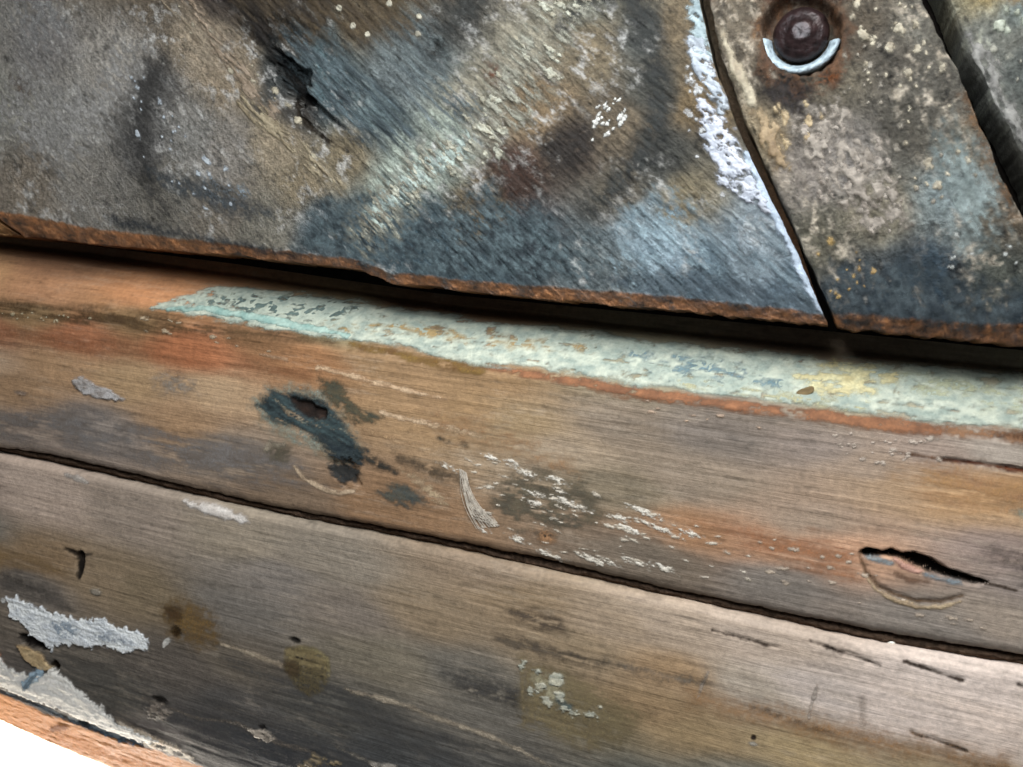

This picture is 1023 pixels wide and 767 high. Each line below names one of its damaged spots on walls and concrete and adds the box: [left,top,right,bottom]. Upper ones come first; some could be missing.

corrosion [753,0,850,117]
damp [0,365,601,543]
peeling [466,454,730,572]
crack [862,547,1017,591]
peeling [0,594,195,763]
peeling [518,660,602,719]